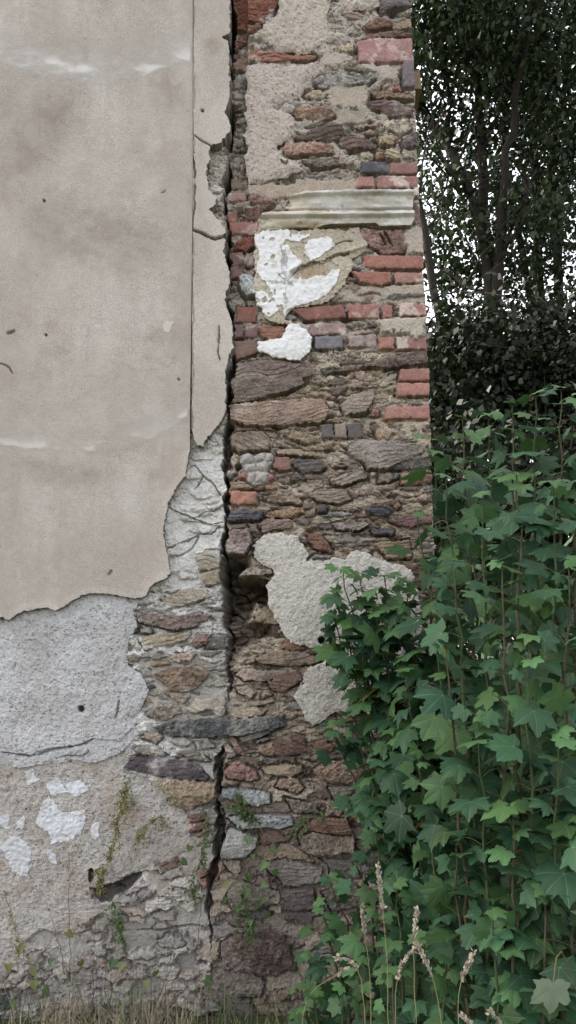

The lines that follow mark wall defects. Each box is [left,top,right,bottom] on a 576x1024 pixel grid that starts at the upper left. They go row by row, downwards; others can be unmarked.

crack [168,0,237,561]
crack [4,738,94,759]
spalling [0,297,309,1020]
crack [112,745,228,972]
crack [226,668,235,702]